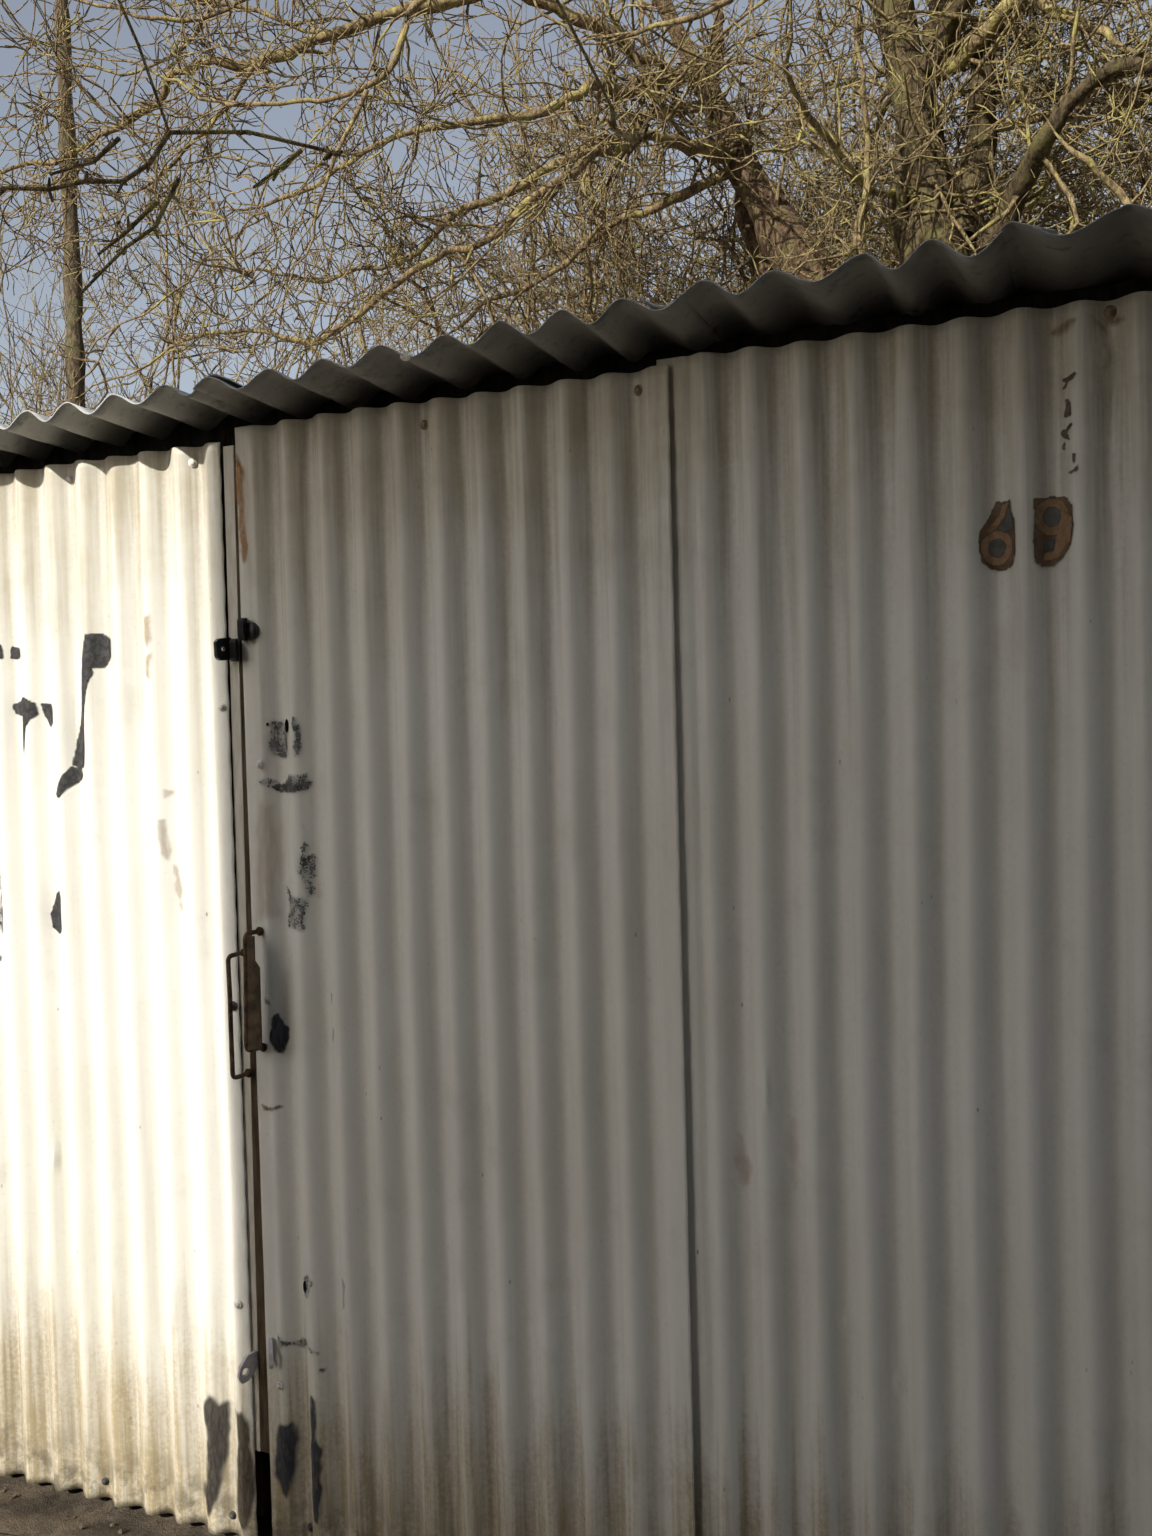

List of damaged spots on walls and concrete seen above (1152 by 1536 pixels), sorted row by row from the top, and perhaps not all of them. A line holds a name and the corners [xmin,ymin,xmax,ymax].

peeling [0,645,20,659]
peeling [12,697,52,754]
peeling [269,717,301,757]
peeling [259,773,313,793]
peeling [287,842,317,932]
peeling [50,891,61,934]
peeling [275,1397,322,1523]